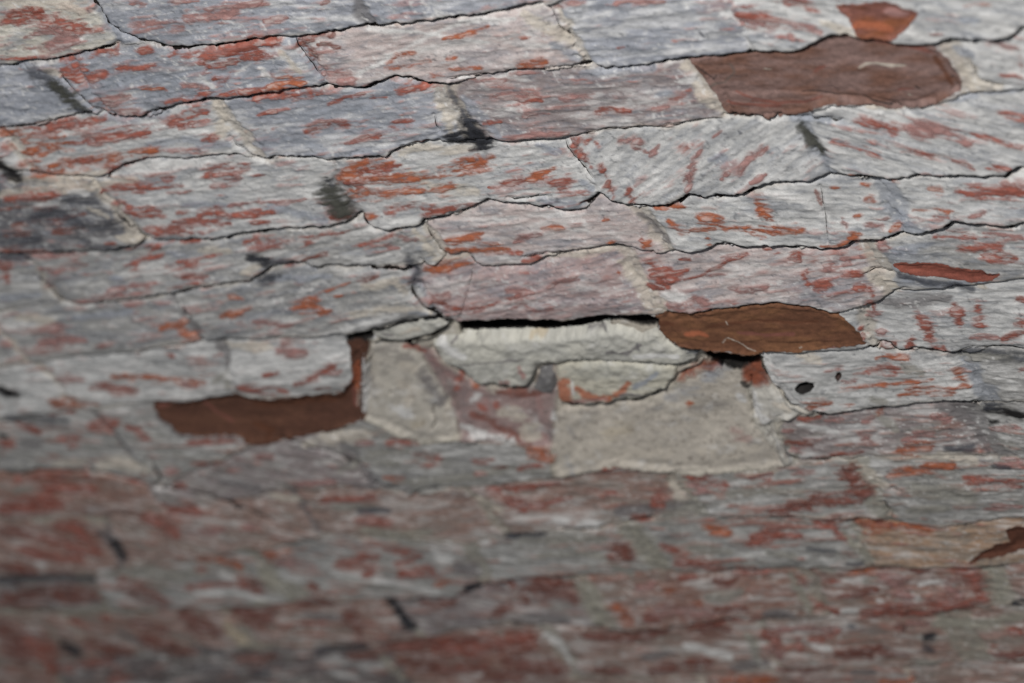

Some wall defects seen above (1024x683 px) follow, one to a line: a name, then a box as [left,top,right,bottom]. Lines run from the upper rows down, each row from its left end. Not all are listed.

crack [7,0,263,127]
crack [296,1,758,88]
crack [728,112,843,121]
spalling [687,0,1016,149]
crack [924,26,1024,95]
peeling [101,176,307,271]
peeling [336,156,494,219]
peeling [487,169,573,190]
crack [88,119,1023,343]
spalling [893,233,1023,283]
spalling [27,203,946,513]
crack [869,340,1023,352]